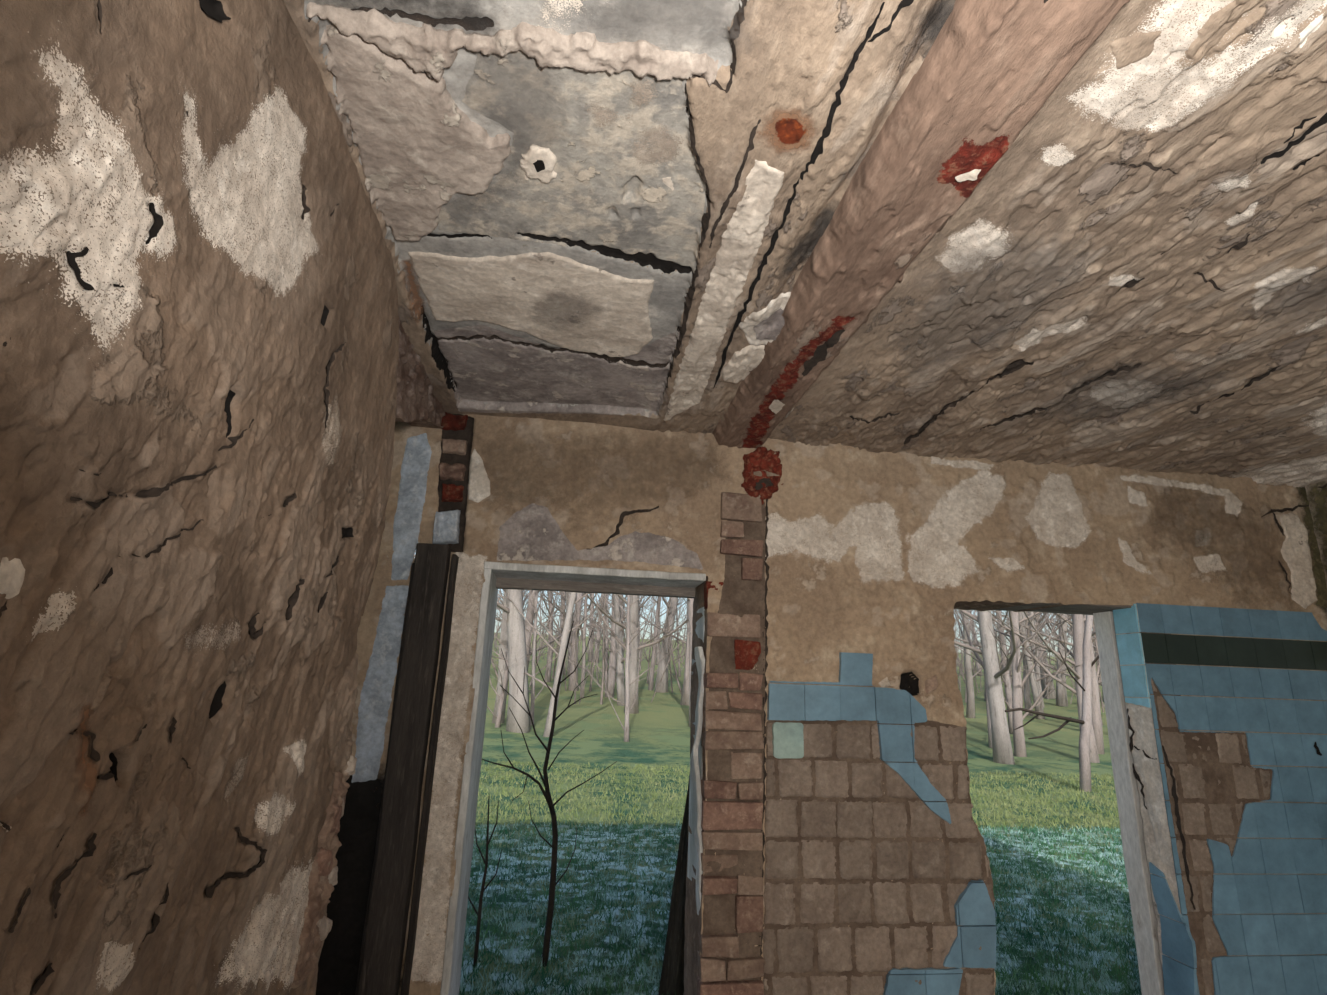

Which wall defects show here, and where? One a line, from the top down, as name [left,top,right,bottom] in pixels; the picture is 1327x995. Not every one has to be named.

spalling [1126,678,1273,995]